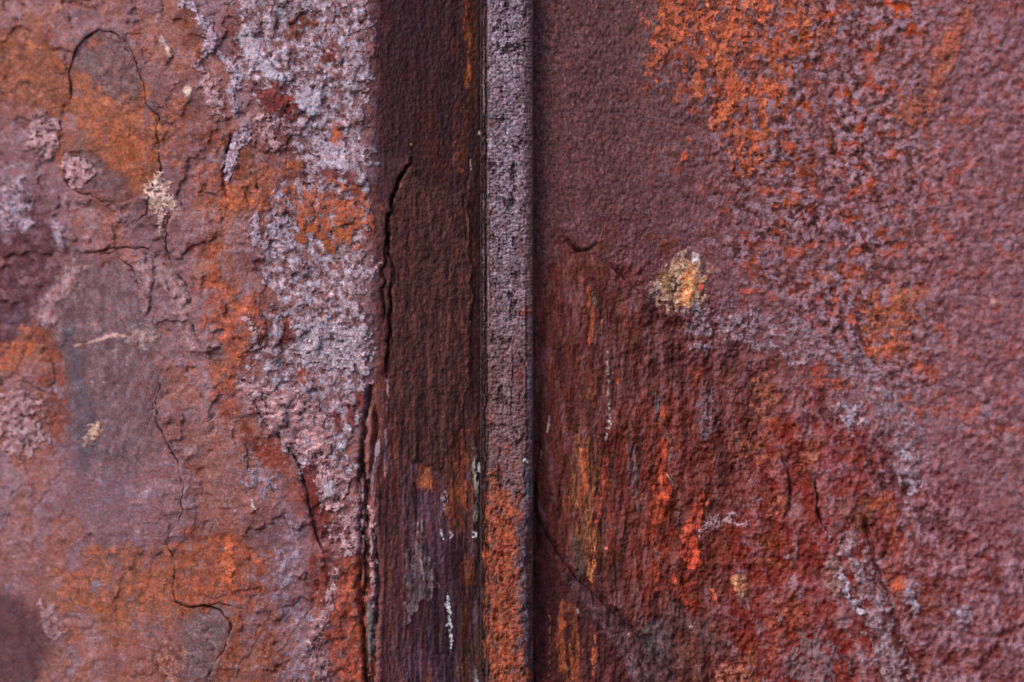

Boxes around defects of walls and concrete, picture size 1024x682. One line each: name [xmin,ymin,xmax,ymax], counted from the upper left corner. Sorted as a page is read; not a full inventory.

crack [64,31,202,349]
crack [147,384,232,675]
rust [0,17,383,682]
crack [258,413,320,545]
crack [358,399,380,682]
crack [381,162,412,370]
rust [416,414,598,682]
rust [562,277,619,583]
rust [616,401,779,615]
rust [635,0,841,196]
rust [855,276,927,359]
rust [884,0,977,129]